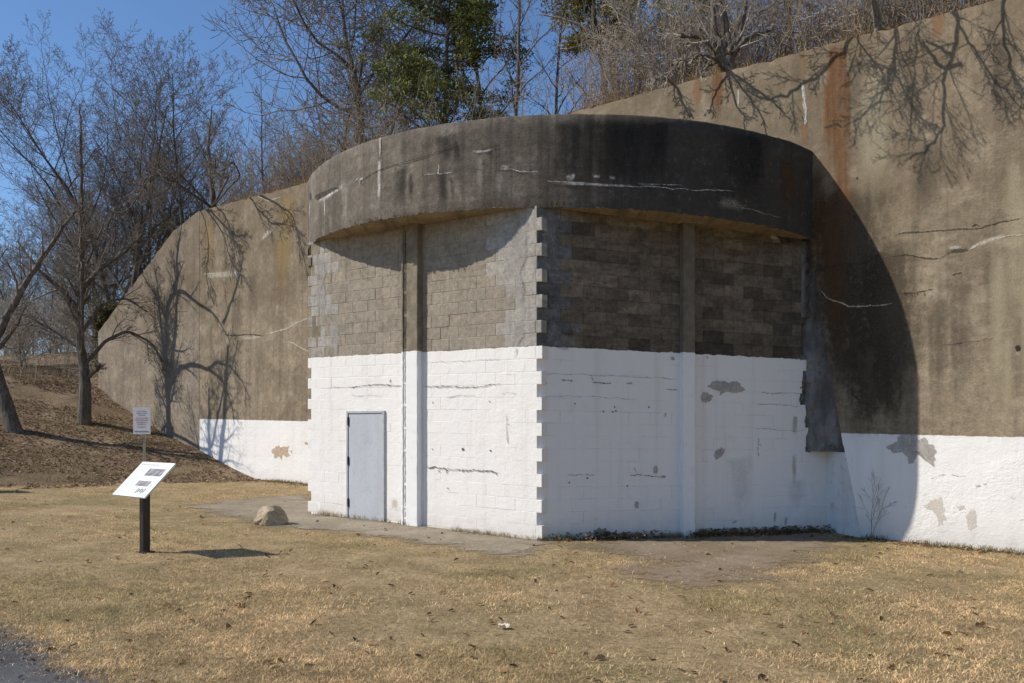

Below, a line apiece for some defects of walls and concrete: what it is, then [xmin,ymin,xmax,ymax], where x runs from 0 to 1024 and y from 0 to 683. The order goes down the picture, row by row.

water stain [505,122,728,191]
crack [891,218,1020,275]
water stain [805,194,911,415]
crack [227,332,262,340]
peeling [700,381,745,403]
peeling [271,446,292,459]
peeling [887,434,936,466]
crack [427,466,497,475]
peeling [924,497,977,531]